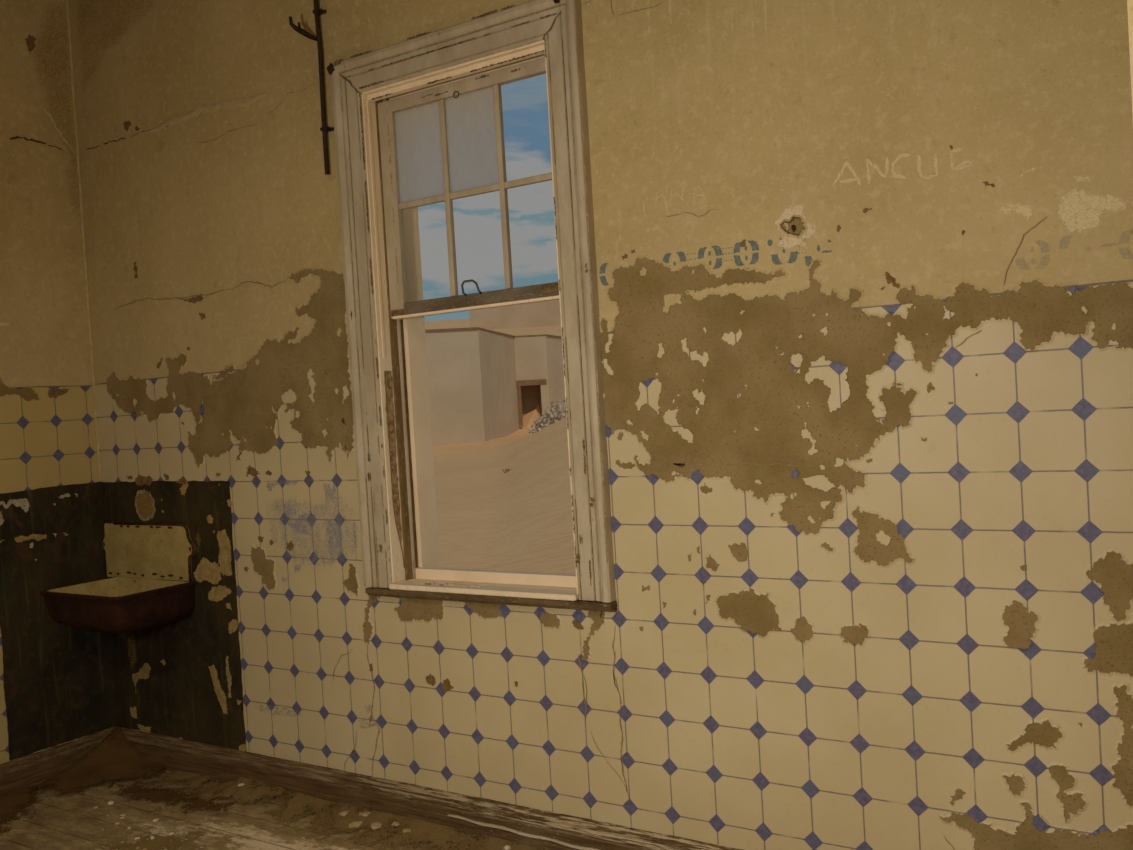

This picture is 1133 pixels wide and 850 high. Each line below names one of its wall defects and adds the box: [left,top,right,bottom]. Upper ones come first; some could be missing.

crack [9,125,169,151]
spalling [779,214,808,239]
crack [115,279,288,310]
spalling [106,5,608,662]
spalling [0,376,70,403]
spalling [599,249,1133,572]
spalling [693,586,816,645]
spalling [838,621,871,648]
peeling [426,674,454,694]
spalling [938,548,1133,850]